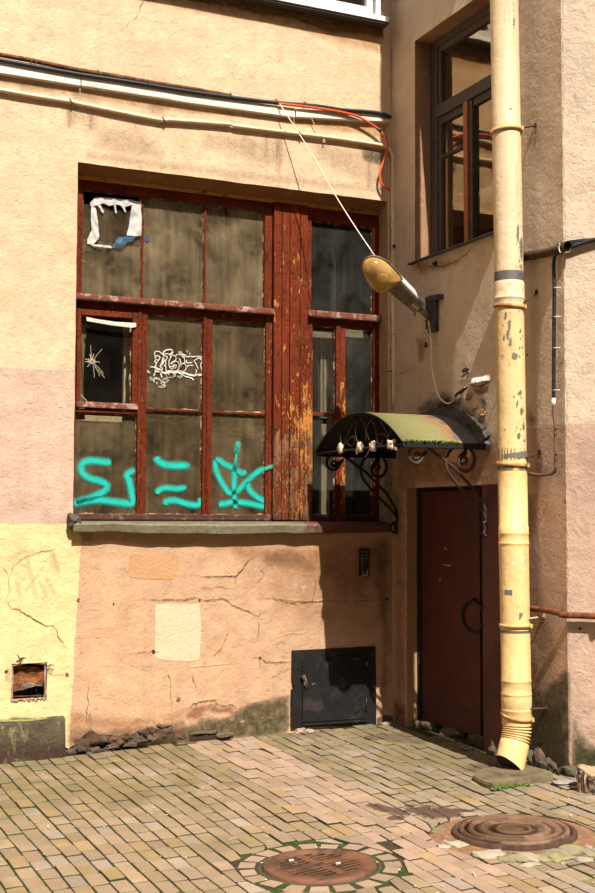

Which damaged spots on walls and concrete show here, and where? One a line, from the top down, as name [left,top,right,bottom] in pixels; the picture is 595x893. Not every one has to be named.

crack [0,547,63,642]
crack [139,547,342,677]
crack [168,632,246,714]
leakage [529,674,570,769]